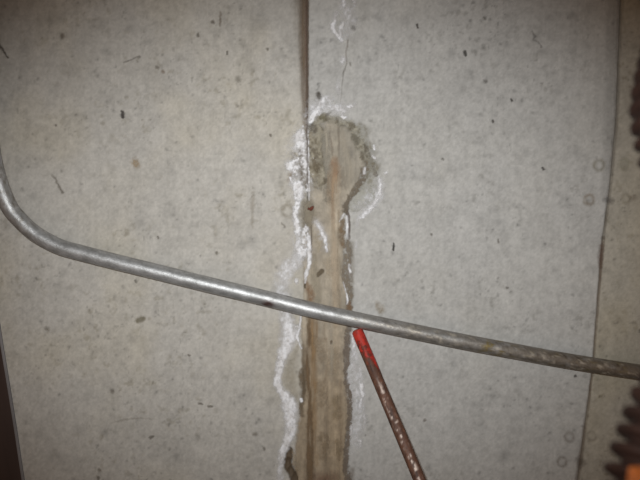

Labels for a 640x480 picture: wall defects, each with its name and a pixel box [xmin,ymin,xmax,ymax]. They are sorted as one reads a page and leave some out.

damp [277,96,388,310]
damp [273,310,365,480]